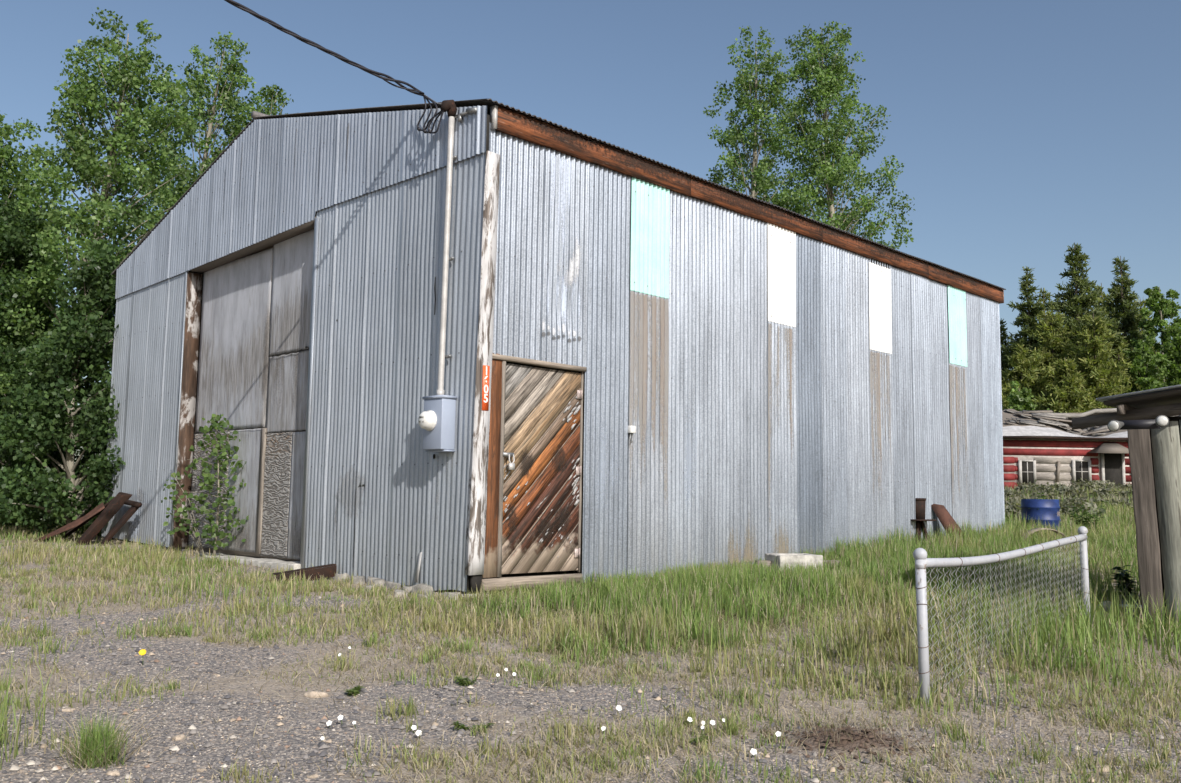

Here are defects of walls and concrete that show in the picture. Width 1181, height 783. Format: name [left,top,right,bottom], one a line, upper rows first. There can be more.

rust [629,292,669,465]
rust [768,323,792,480]